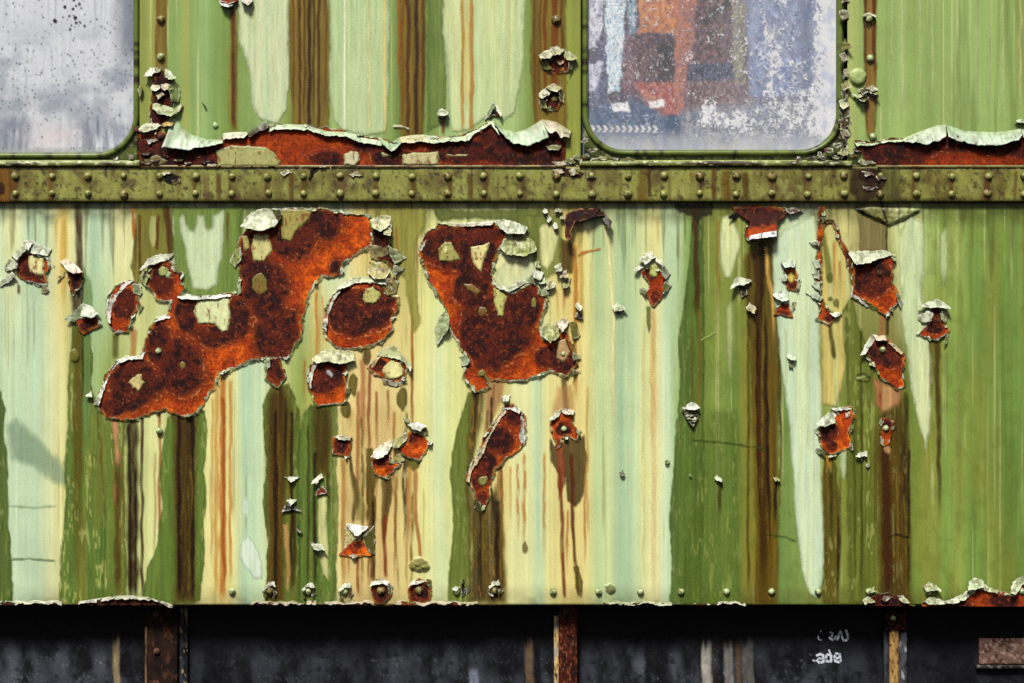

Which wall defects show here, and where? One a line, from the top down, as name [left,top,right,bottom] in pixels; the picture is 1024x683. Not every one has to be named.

peeling [113,101,635,167]
peeling [797,39,1024,161]
rust [0,0,600,606]
peeling [526,261,571,296]
rust [675,169,802,602]